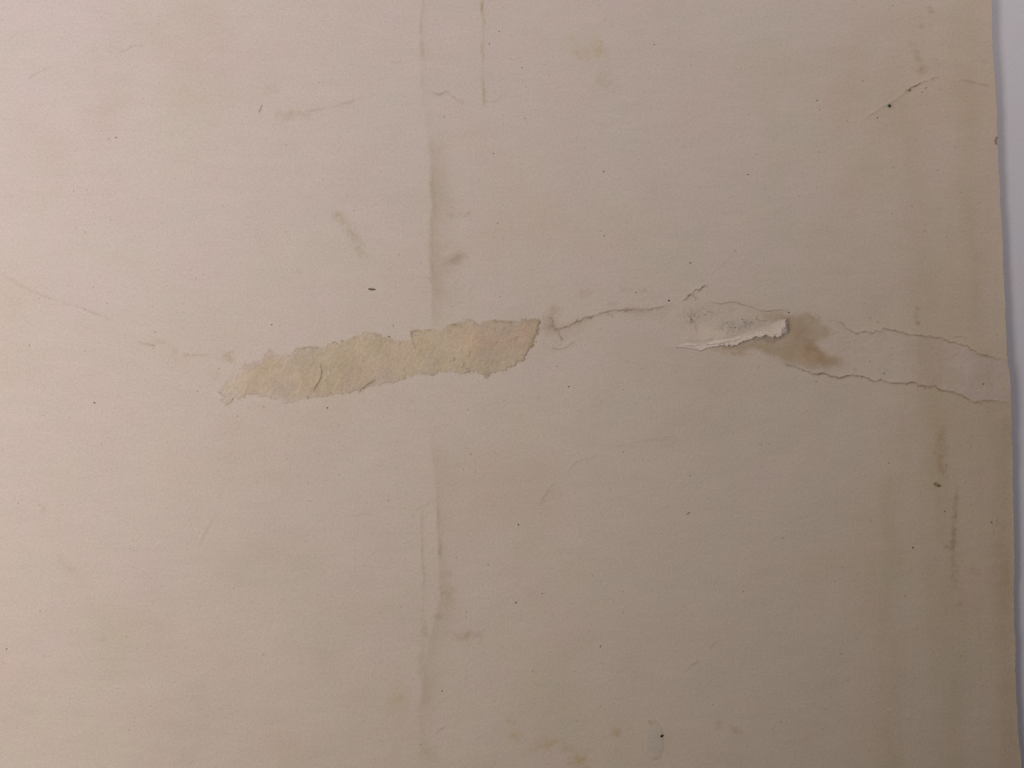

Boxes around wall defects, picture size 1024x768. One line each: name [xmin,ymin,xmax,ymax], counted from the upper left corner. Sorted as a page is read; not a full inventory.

peeling [217,315,542,407]
water stain [706,307,851,366]